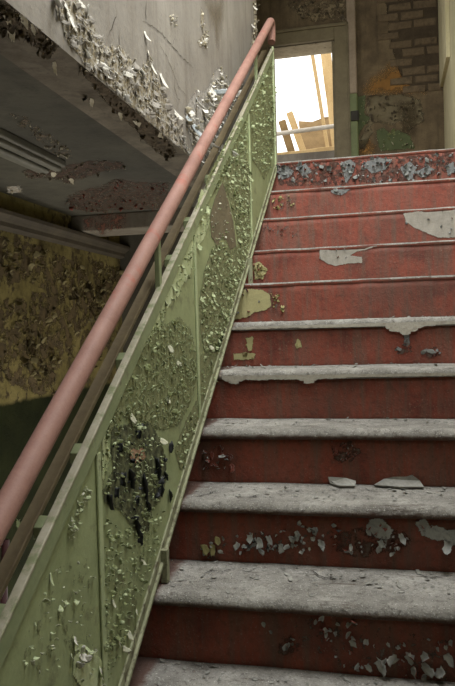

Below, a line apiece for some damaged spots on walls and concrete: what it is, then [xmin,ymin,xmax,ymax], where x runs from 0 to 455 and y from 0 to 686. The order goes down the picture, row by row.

spalling [53,0,230,161]
spalling [23,160,170,214]
peeling [0,236,124,396]
peeling [65,62,455,686]
peeling [35,561,96,640]